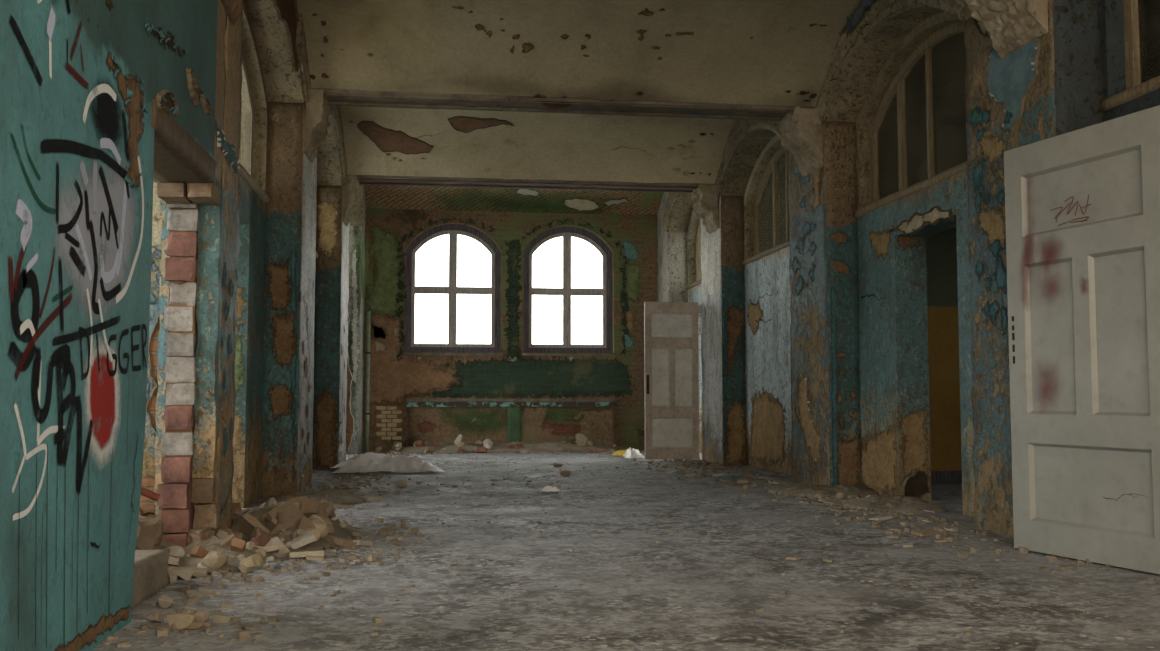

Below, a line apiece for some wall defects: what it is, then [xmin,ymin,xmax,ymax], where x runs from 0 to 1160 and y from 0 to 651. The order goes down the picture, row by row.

flaking render [272,0,329,80]
peeling [452,6,534,54]
flaking render [106,50,179,191]
flaking render [349,121,434,162]
flaking render [448,116,514,133]
peeling [791,164,817,296]
flaking render [869,206,954,261]
peeling [966,18,1041,338]
peeling [222,262,245,458]
flaking render [264,198,640,492]
flaking render [712,287,934,497]
flaking render [139,474,156,516]